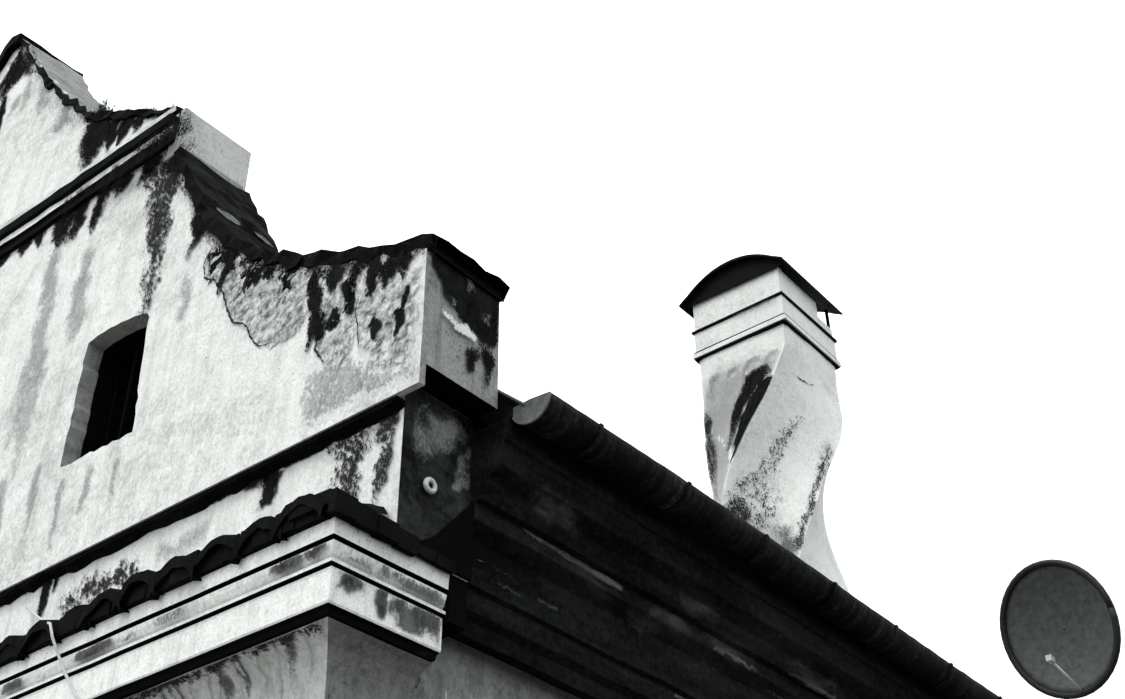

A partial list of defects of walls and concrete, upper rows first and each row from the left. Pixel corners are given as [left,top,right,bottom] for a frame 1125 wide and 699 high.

damp [0,74,144,171]
damp [136,137,197,323]
damp [207,239,224,283]
spalling [203,249,423,427]
damp [305,255,396,352]
damp [368,284,410,340]
damp [481,345,496,388]
damp [348,436,393,504]
damp [703,349,833,554]
damp [209,656,251,699]
damp [281,637,296,675]